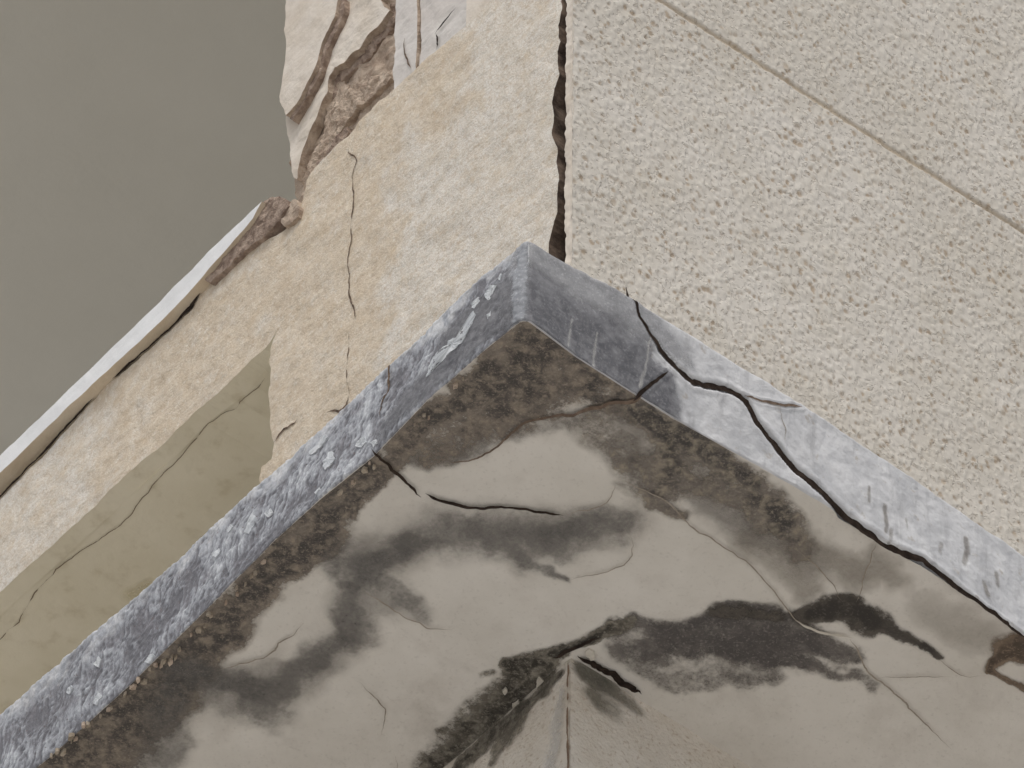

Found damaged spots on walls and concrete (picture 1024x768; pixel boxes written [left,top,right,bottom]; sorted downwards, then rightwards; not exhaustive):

flaking render [205,0,396,286]
crack [328,152,357,413]
spalling [50,693,113,759]
spalling [123,647,181,698]
peeling [227,508,273,534]
water stain [37,241,861,768]
crack [367,450,976,741]
water stain [416,594,944,768]
crack [451,288,1024,637]